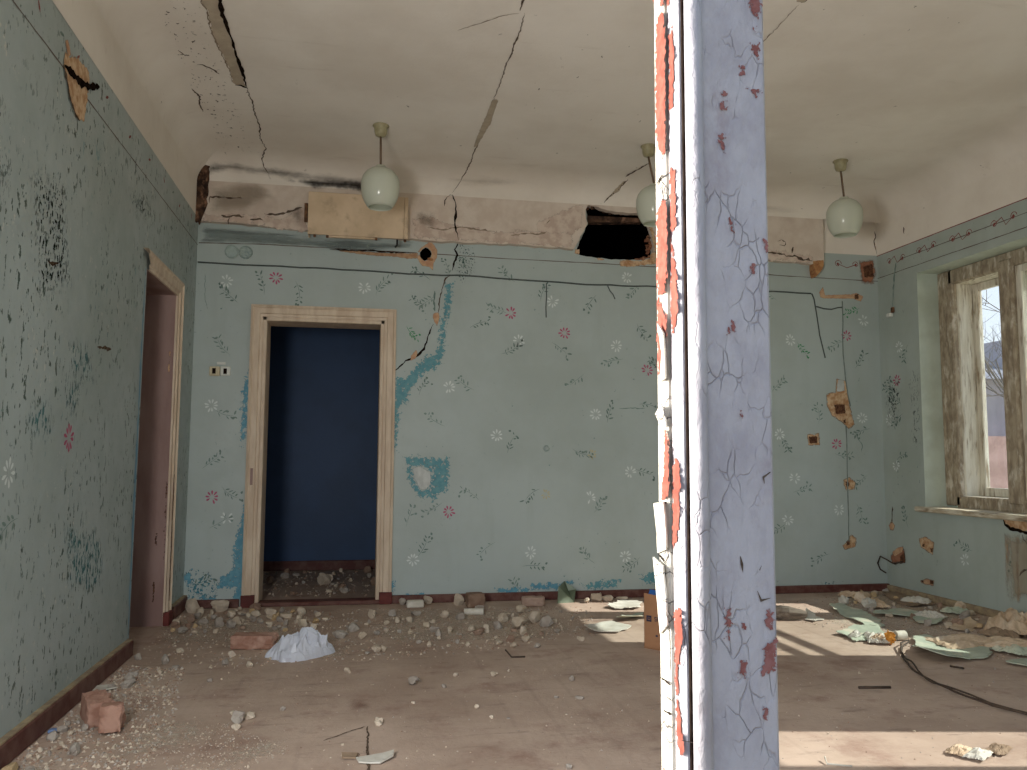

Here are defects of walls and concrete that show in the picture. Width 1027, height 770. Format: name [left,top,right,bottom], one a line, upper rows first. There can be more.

peeling [748,0,763,60]
crack [763,0,807,42]
crack [178,0,270,178]
peeling [652,0,674,156]
crack [395,0,525,371]
crack [605,163,663,201]
flaking render [330,167,679,447]
spalling [826,379,855,429]
peeling [405,454,450,503]
peeling [638,404,684,755]
peeling [761,609,779,677]
crack [323,726,371,770]